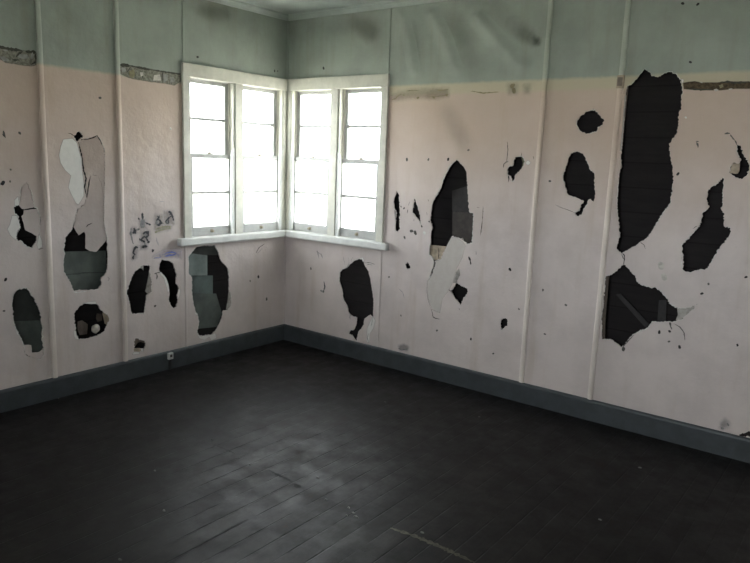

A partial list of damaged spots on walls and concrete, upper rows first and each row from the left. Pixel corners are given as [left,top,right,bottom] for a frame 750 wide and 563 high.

spalling [576,108,604,134]
spalling [59,131,109,293]
spalling [393,191,421,232]
spalling [427,160,474,319]
spalling [503,142,534,182]
spalling [556,151,596,216]
spalling [601,69,750,351]
spalling [12,287,44,360]
spalling [73,301,110,339]
spalling [127,259,180,314]
spalling [188,245,232,340]
spalling [339,257,375,342]